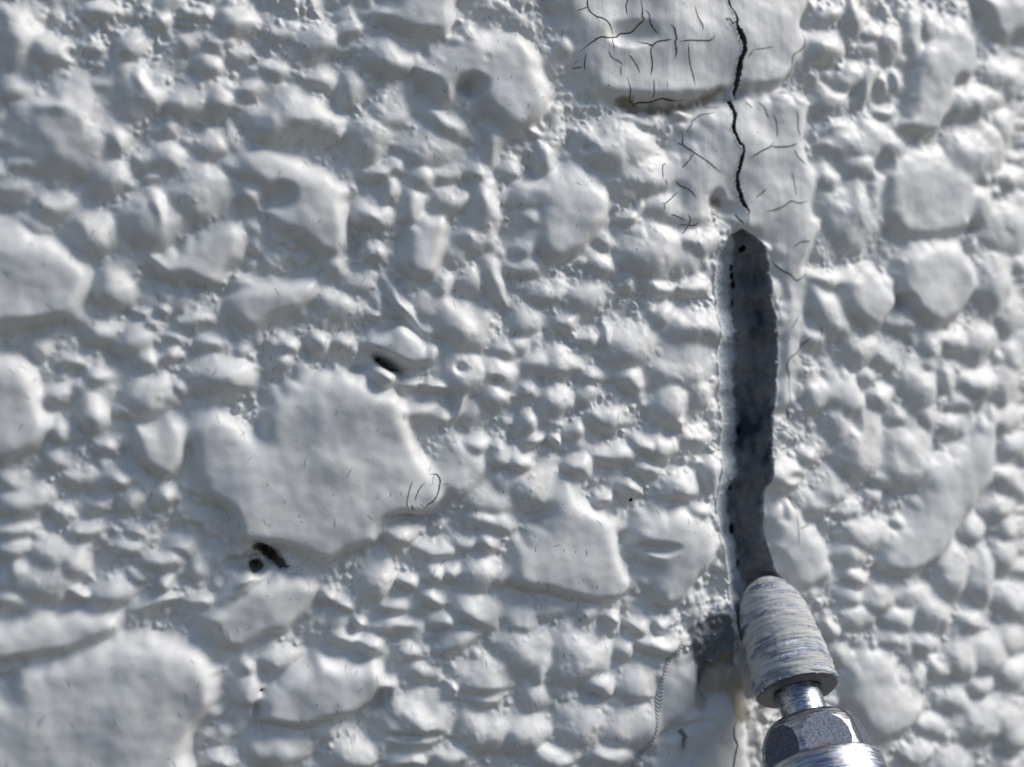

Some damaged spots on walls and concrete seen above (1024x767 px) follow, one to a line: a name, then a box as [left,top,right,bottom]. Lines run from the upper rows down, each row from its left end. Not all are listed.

crack [572,0,807,234]